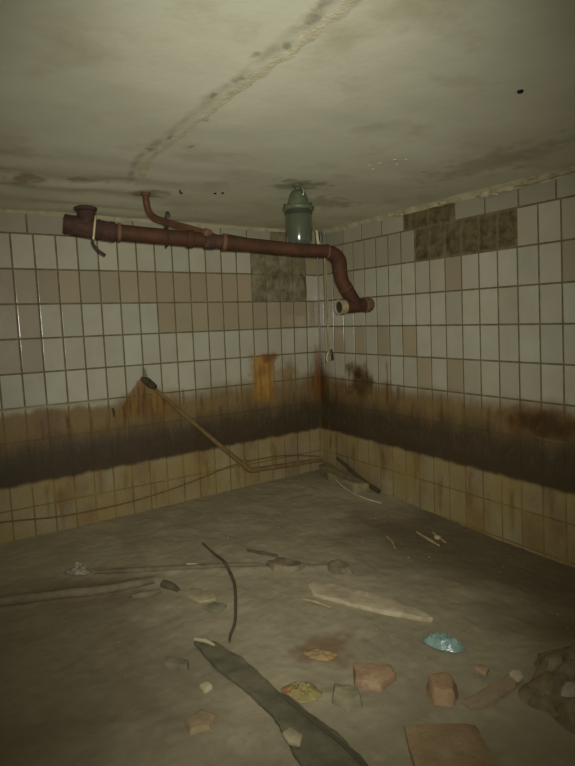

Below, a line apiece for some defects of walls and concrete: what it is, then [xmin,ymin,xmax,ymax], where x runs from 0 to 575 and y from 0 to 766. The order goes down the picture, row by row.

crack [135,0,364,186]
corrosion [253,355,275,399]
damp [0,377,575,568]
corrosion [348,366,373,396]